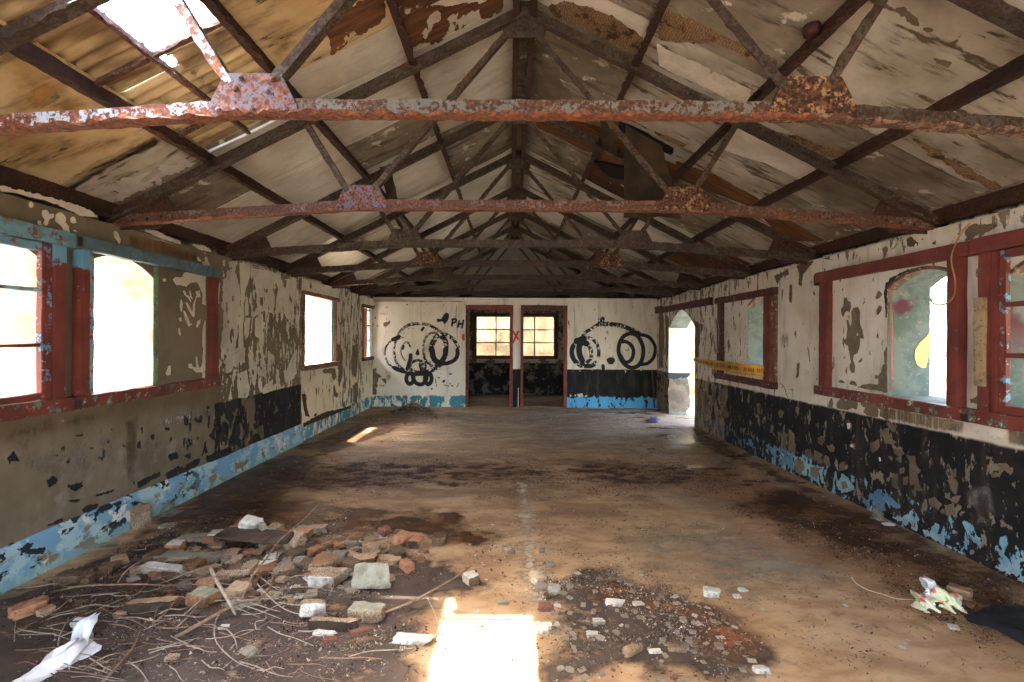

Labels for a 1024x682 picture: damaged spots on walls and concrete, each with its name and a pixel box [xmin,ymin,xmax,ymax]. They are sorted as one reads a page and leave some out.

peeling [765,219,823,241]
peeling [965,223,996,241]
peeling [774,256,830,303]
peeling [302,343,358,427]
peeling [766,409,854,492]
peeling [861,403,981,555]
peeling [990,463,1013,478]
peeling [995,545,1024,582]